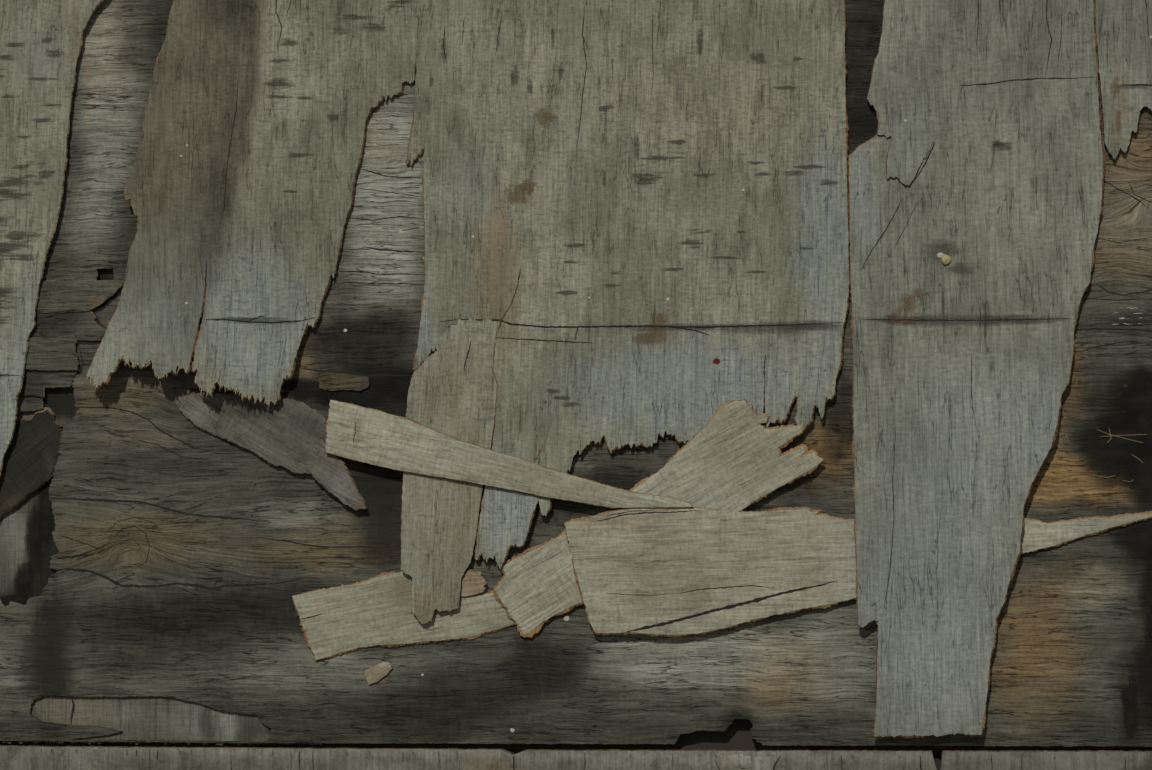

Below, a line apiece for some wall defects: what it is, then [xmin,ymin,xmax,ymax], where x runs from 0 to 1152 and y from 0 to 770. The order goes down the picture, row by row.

spalling [17,280,122,413]
peeling [317,371,370,392]
crack [447,266,840,369]
crack [868,283,1152,352]
leakage [1077,369,1152,737]